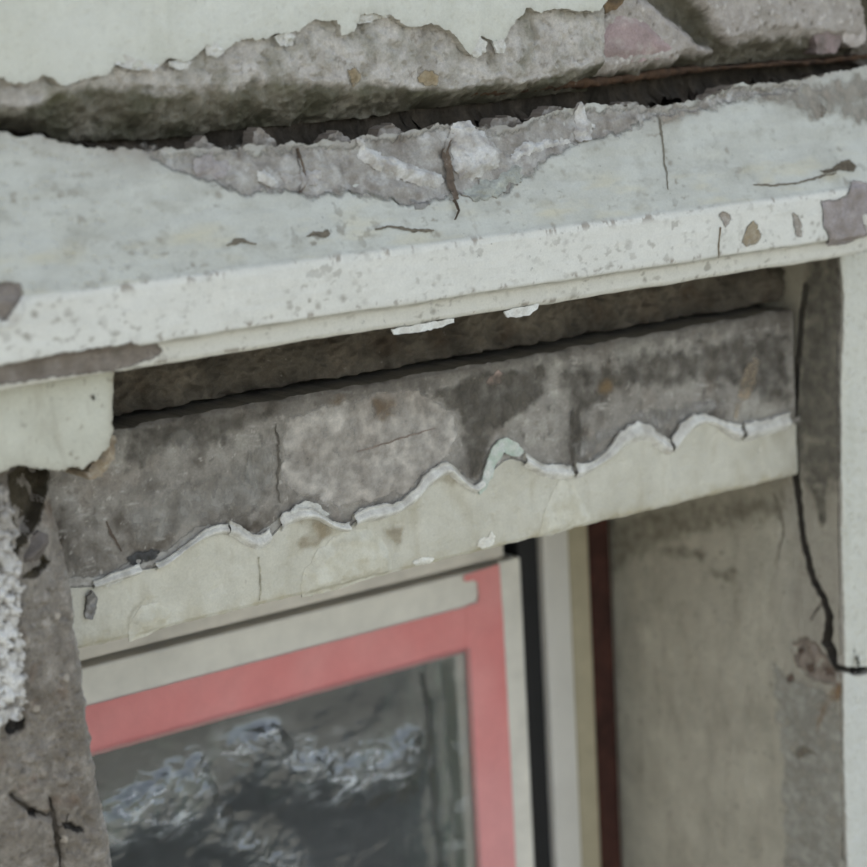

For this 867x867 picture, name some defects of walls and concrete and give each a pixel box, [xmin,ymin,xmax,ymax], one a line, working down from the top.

crack [11,127,43,135]
spalling [0,0,867,220]
crack [71,48,857,190]
peeling [820,159,867,246]
peeling [0,282,26,328]
peeling [0,342,162,385]
leakage [127,365,545,539]
leakage [564,334,787,456]
spalling [8,465,50,579]
peeling [69,412,801,620]
crack [832,650,866,674]
crack [10,793,69,867]